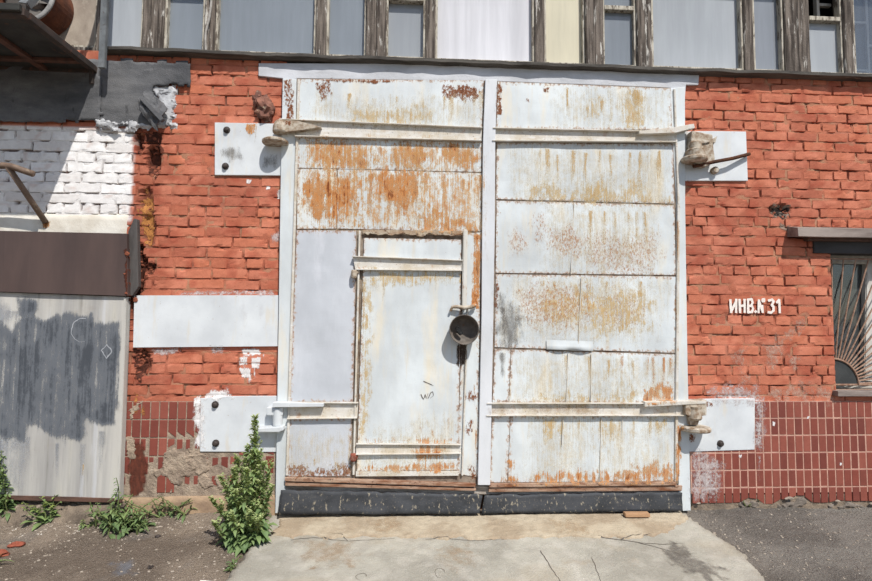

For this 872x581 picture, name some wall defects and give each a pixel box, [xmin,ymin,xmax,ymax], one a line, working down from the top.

corrosion [348,94,432,127]
corrosion [442,84,481,106]
corrosion [137,189,155,246]
corrosion [301,135,485,309]
corrosion [516,152,670,334]
corrosion [358,267,461,443]
spalling [126,436,136,459]
spalling [150,448,226,493]
corrosion [285,460,352,479]
corrosion [365,431,454,474]
corrosion [534,425,695,486]